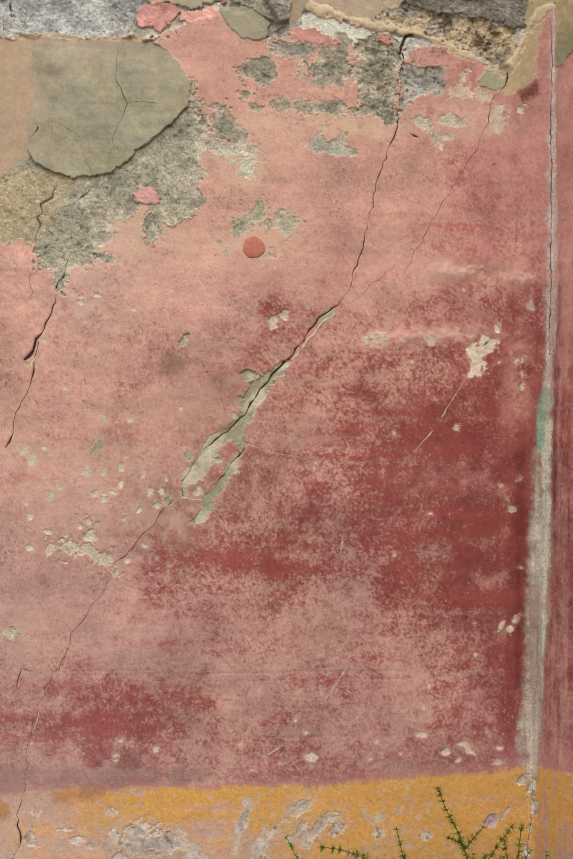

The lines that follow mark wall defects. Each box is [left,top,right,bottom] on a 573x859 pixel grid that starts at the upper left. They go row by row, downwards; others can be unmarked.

crack [0,255,70,452]
crack [33,186,57,252]
crack [35,114,104,216]
spalling [180,360,292,526]
spalling [0,33,527,306]
crack [112,34,508,563]
peeling [466,323,501,378]
leakage [515,6,560,781]
spalling [44,514,132,578]
crack [12,581,108,859]
peeling [106,808,214,859]
peeling [233,798,347,859]